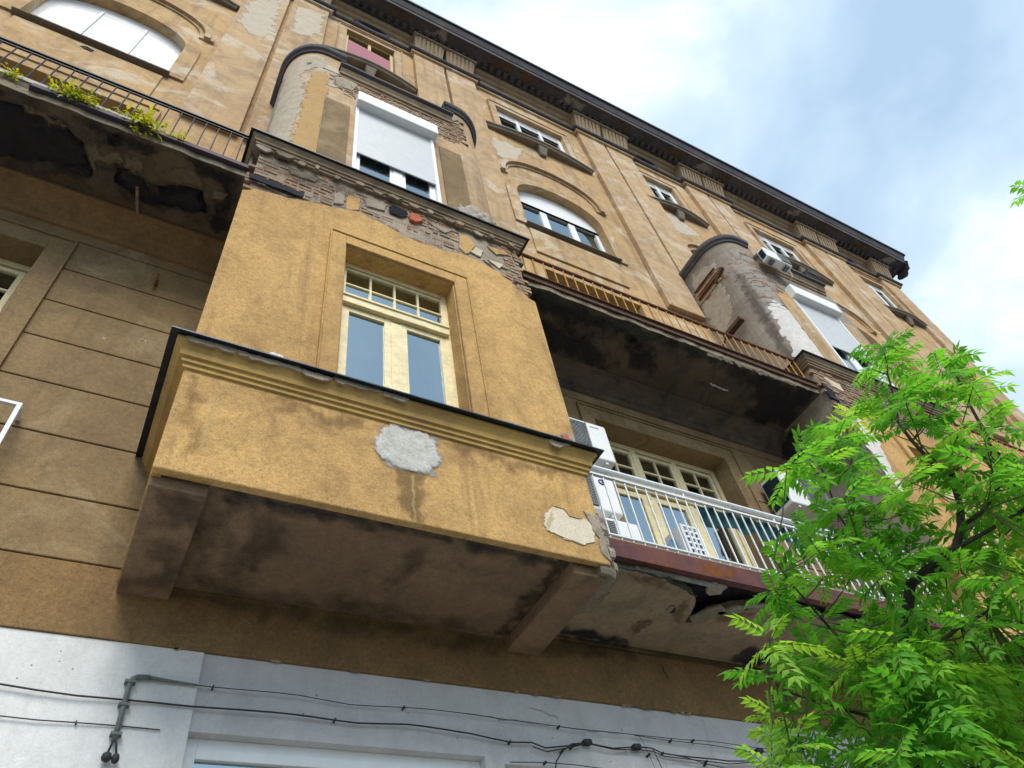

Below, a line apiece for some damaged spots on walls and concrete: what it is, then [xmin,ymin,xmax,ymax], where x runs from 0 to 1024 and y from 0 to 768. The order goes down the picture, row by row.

spalling [0,101,228,214]
spalling [241,55,535,302]
leakage [533,293,813,464]
flaking render [692,261,733,344]
flaking render [767,300,824,358]
spalling [544,505,619,615]
spalling [635,566,764,624]